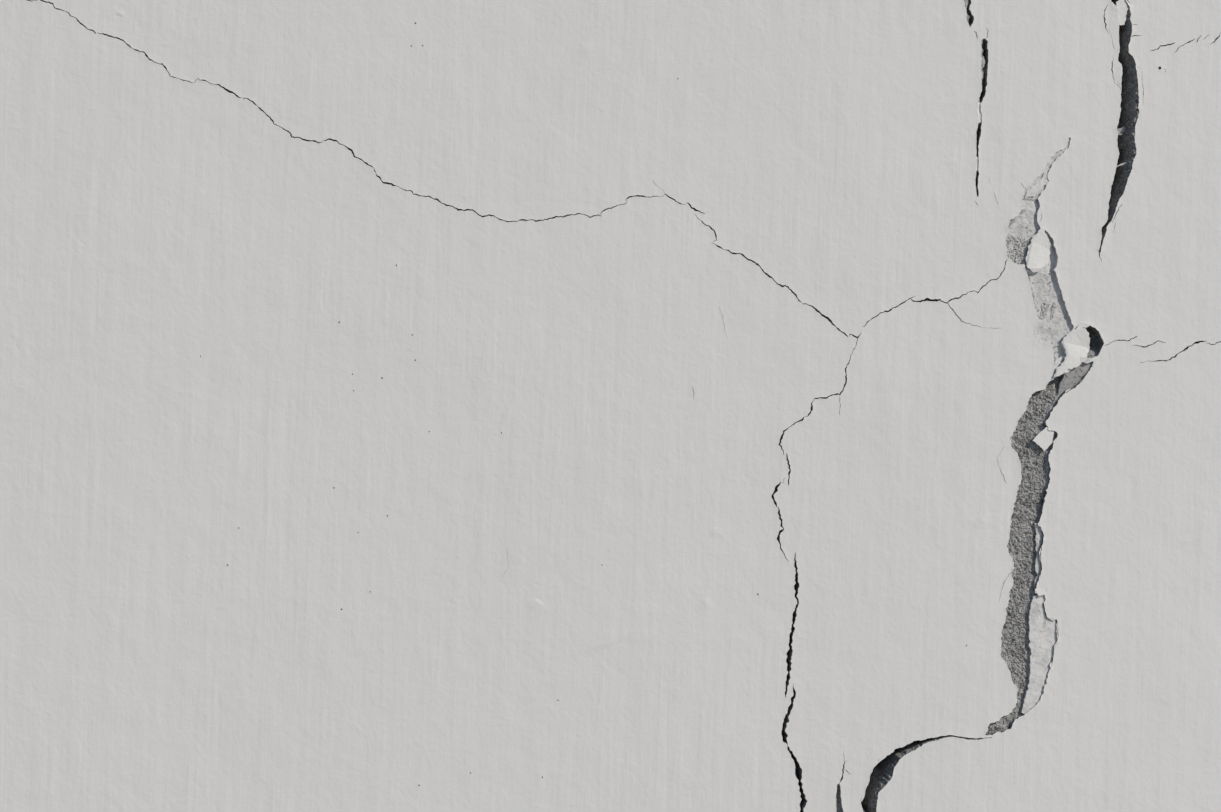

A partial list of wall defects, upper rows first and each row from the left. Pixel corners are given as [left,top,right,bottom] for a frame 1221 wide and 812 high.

crack [40,0,1008,812]
spalling [986,137,1105,735]
crack [1099,0,1220,262]
crack [1105,336,1221,363]